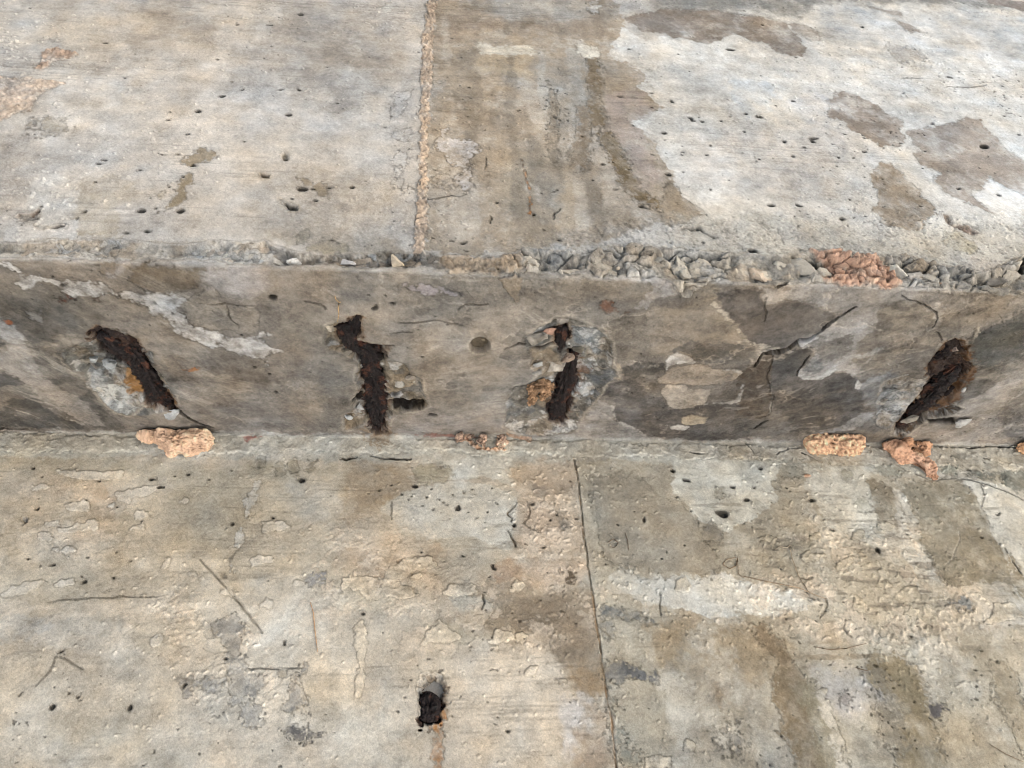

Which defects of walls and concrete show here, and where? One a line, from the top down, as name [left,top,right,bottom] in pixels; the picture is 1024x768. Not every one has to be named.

leakage [545,43,704,225]
leakage [869,162,937,232]
leakage [826,91,1024,214]
crack [762,281,789,322]
spalling [59,325,180,420]
spalling [322,315,430,433]
spalling [503,316,619,437]
crack [746,306,856,461]
spalling [873,324,981,439]